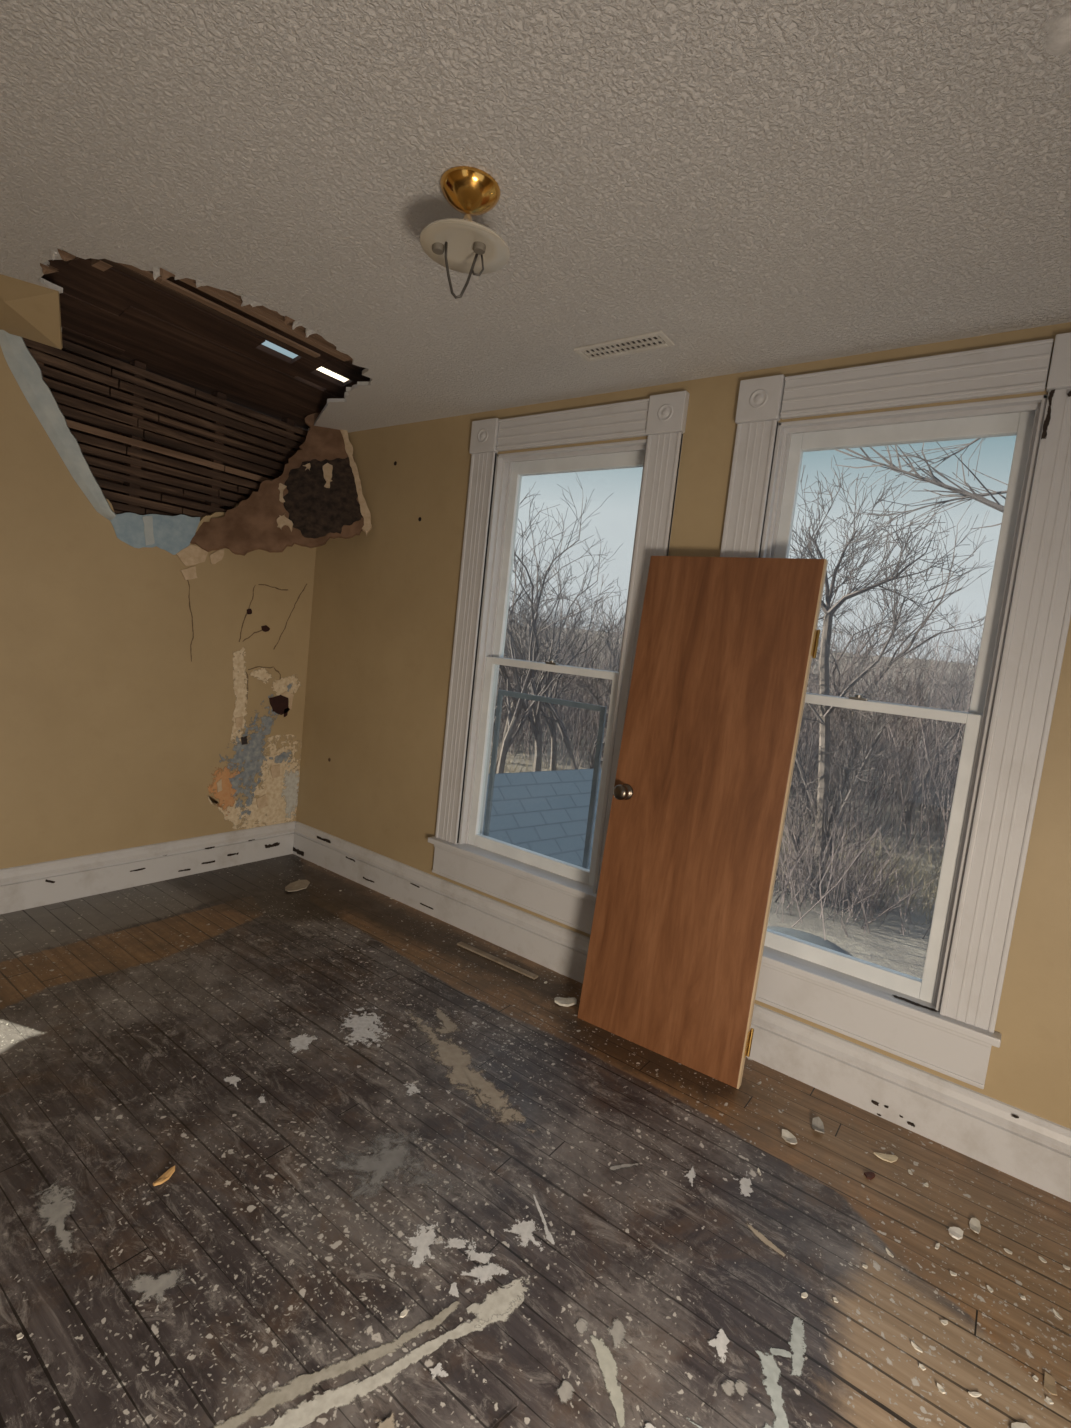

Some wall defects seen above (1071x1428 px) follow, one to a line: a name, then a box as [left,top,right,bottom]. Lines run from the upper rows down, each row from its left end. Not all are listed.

flaking render [0,330,224,580]
flaking render [277,483,293,532]
flaking render [303,463,333,488]
spalling [340,429,372,537]
peeling [178,647,304,872]